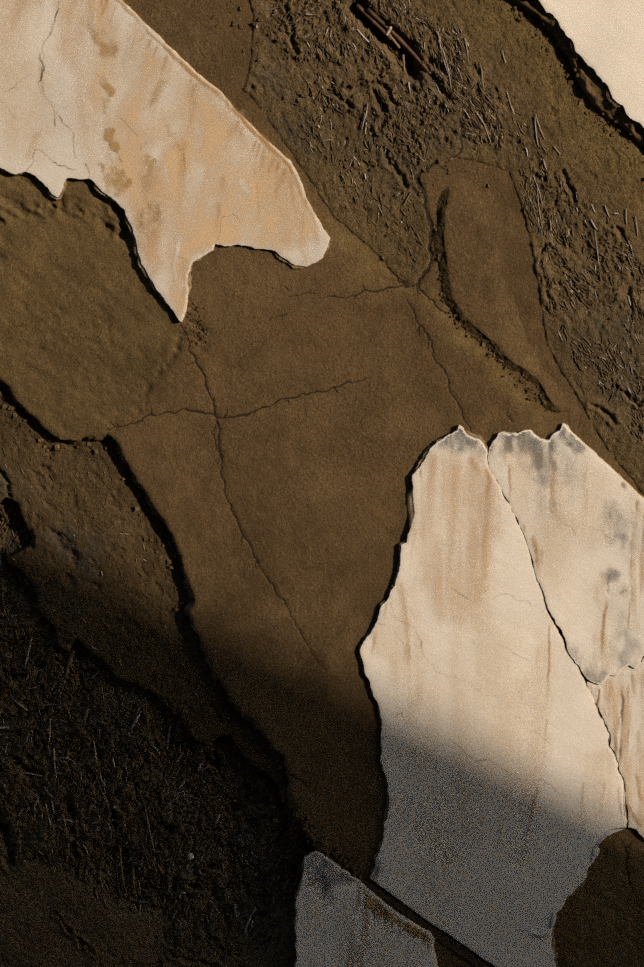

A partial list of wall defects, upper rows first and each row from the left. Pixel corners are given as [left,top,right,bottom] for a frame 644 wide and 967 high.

peeling [0,0,330,347]
crack [271,117,472,431]
crack [107,325,366,670]
spalling [242,0,644,967]
mould [504,426,584,479]
spalling [0,383,438,967]
crack [513,592,619,769]
damp [364,889,432,942]